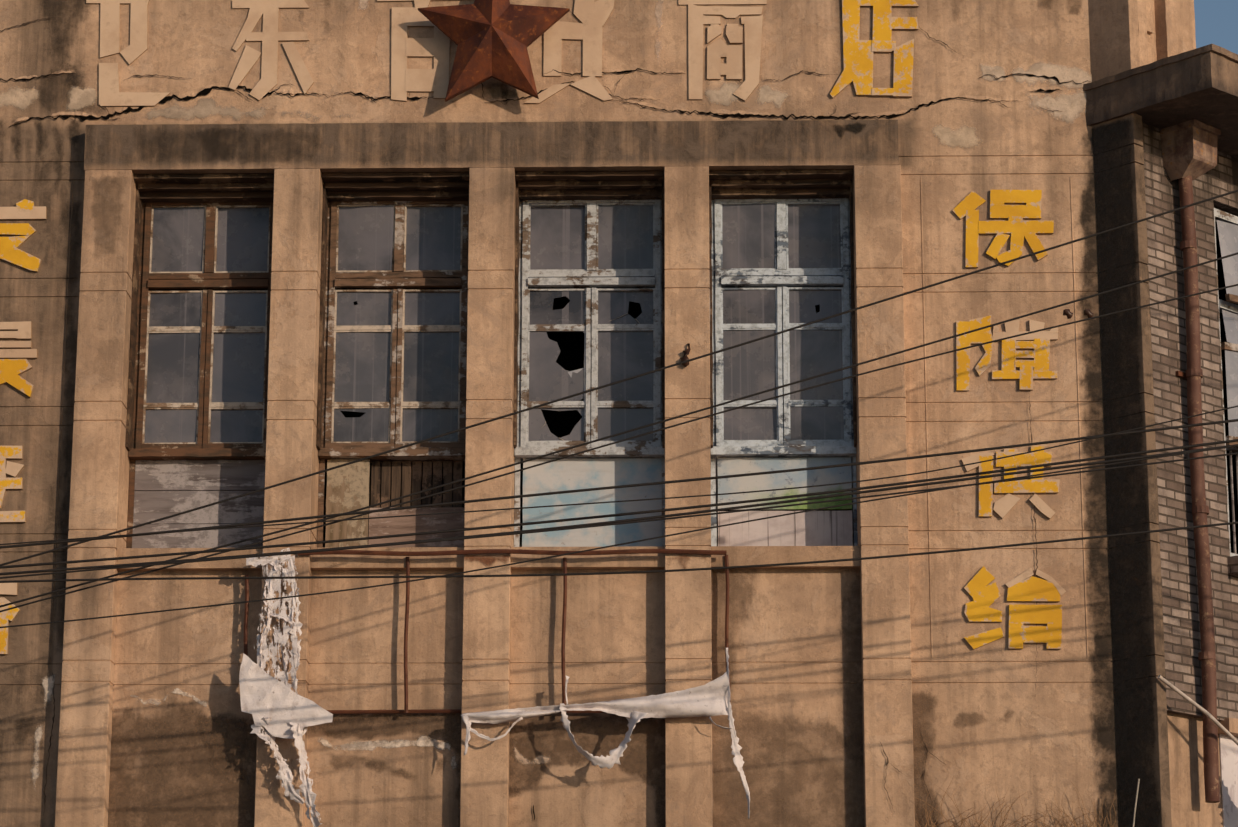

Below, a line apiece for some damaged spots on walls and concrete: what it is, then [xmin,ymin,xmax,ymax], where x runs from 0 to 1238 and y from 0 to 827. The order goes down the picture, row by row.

crack [0,17,61,32]
crack [0,69,76,82]
flaking render [0,88,38,109]
flaking render [68,87,97,110]
crack [9,74,434,127]
crack [481,68,1090,120]
flaking render [981,62,1092,123]